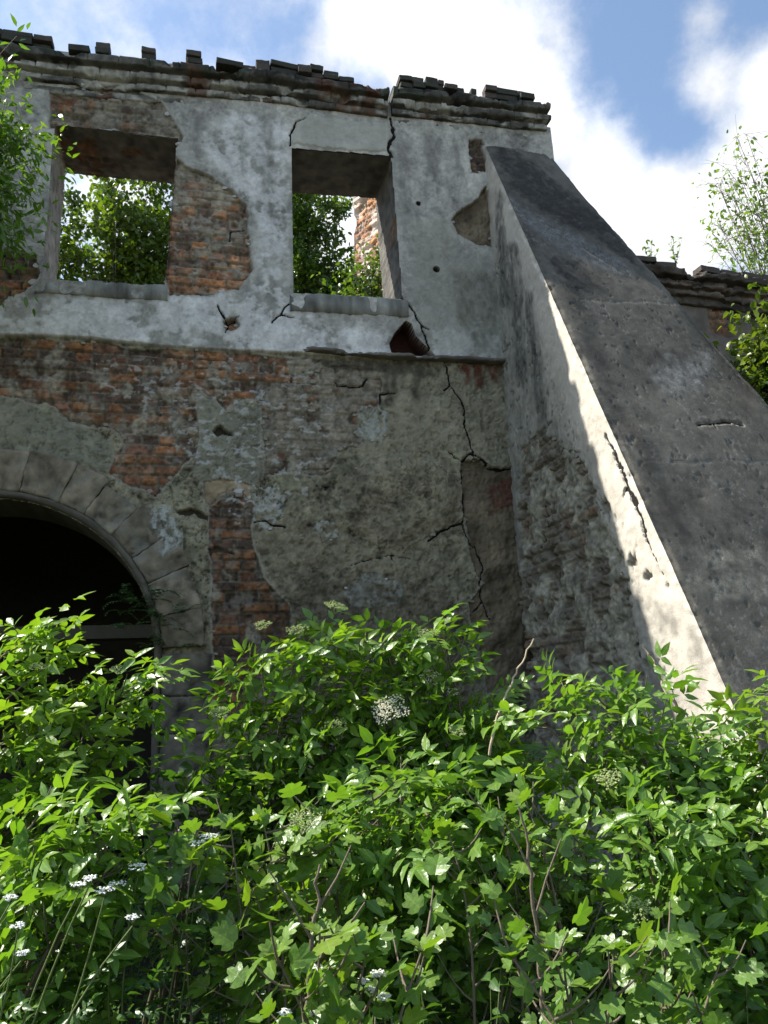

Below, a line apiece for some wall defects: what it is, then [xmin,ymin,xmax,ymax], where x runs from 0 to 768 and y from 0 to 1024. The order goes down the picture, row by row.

crack [387,118,395,157]
flaking render [468,140,486,173]
flaking render [166,160,252,296]
flaking render [452,190,491,247]
crack [217,305,235,333]
crack [271,304,294,323]
crack [335,380,395,405]
crack [697,419,741,427]
crack [401,298,511,620]
flaking render [0,336,388,715]
crack [607,438,664,575]
flaking render [461,430,653,797]